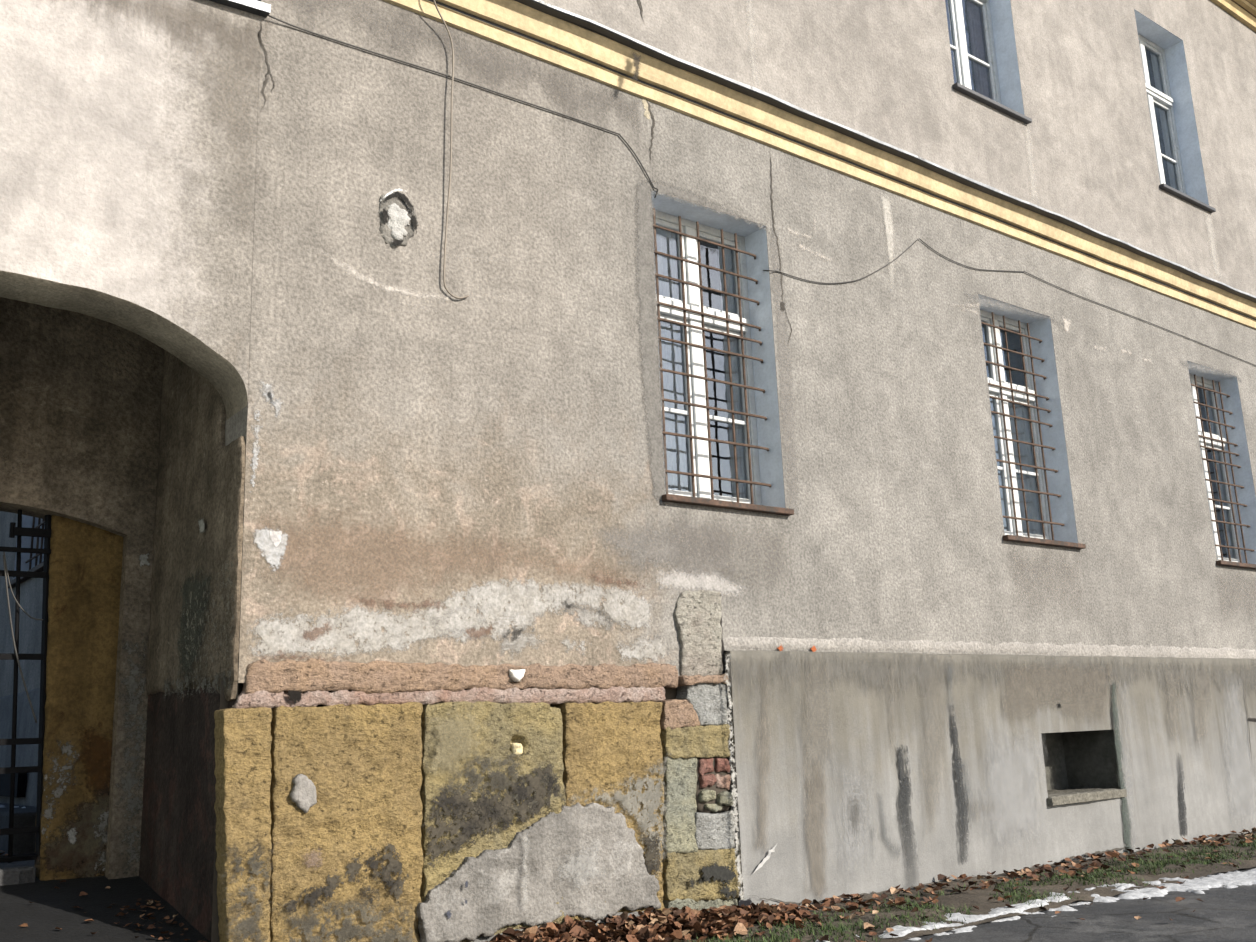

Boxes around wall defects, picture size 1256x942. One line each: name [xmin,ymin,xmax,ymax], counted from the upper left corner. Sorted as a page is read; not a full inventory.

crack [258,20,275,110]
spalling [378,189,419,249]
crack [770,155,792,343]
peeling [254,527,288,571]
flaking render [251,576,669,662]
peeling [41,739,80,838]
leakage [687,654,745,902]
leakage [897,745,915,847]
leakage [951,704,969,862]
leakage [1111,683,1132,854]
leakage [1179,764,1188,835]
peeling [643,831,661,875]